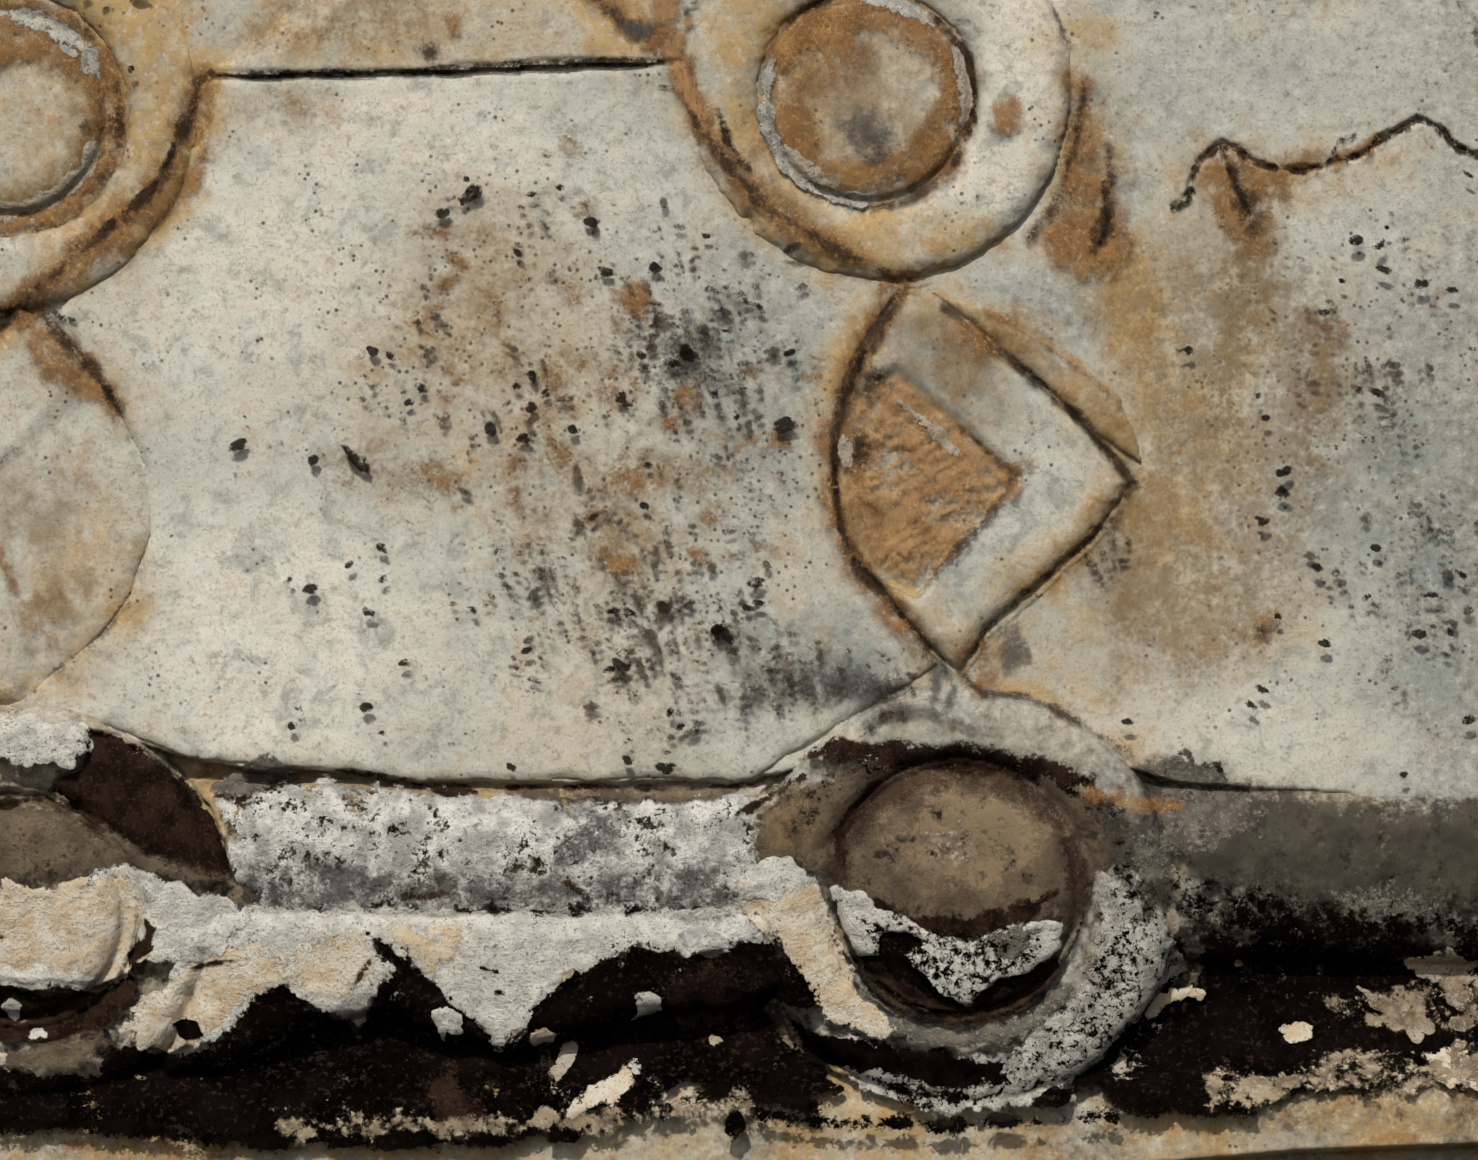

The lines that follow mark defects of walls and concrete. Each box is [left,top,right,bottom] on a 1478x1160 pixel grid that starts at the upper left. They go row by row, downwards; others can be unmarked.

corrosion [420,42,439,57]
crack [184,56,683,124]
corrosion [1197,132,1384,260]
crack [1170,115,1478,215]
corrosion [592,0,1139,704]
water stain [411,224,1163,955]
spalling [0,712,1478,1117]
water stain [0,868,1478,1155]
peeling [275,1058,755,1144]